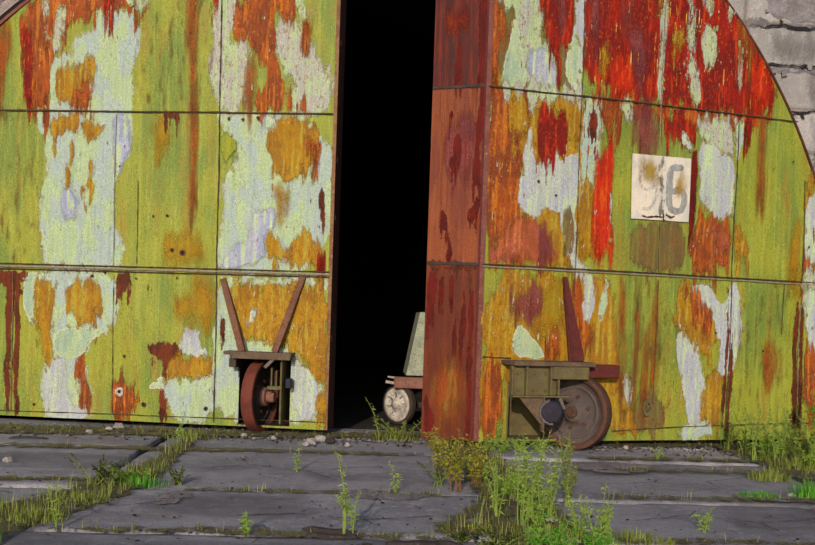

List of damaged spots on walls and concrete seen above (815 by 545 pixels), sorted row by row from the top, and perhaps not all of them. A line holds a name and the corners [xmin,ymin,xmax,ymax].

rust [0,270,106,416]
rust [0,0,146,190]
peeling [22,0,151,419]
rust [115,270,138,308]
rust [147,341,212,423]
peeling [149,0,335,427]
rust [230,0,329,430]
peeling [499,0,611,323]
rust [423,0,779,441]
peeling [673,322,712,440]
peeling [684,283,745,381]
peeling [801,194,815,352]